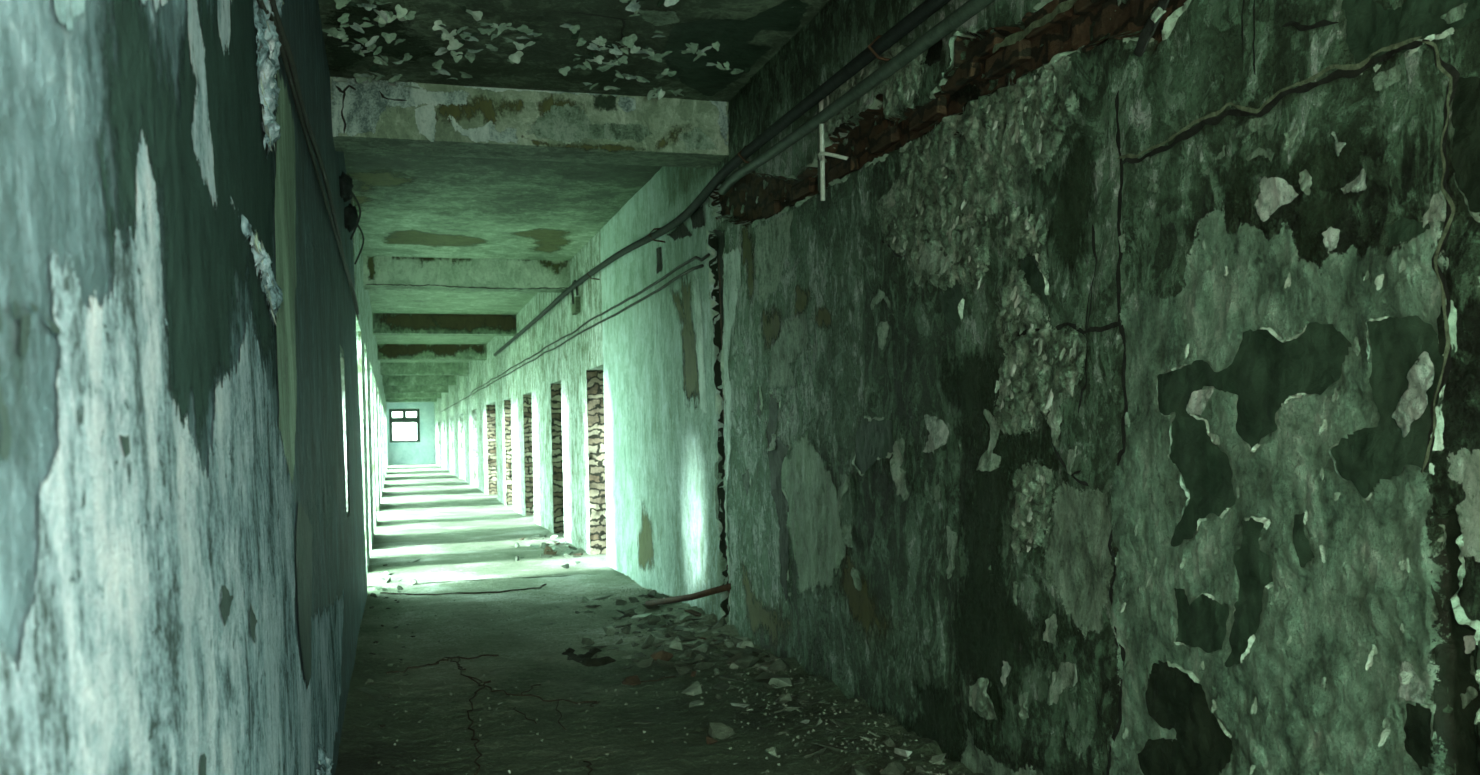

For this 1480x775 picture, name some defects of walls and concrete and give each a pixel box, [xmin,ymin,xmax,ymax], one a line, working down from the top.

peeling [54,0,85,31]
peeling [187,0,232,207]
spalling [322,0,809,146]
spalling [1342,0,1480,91]
spalling [656,0,1191,502]
crack [1018,0,1460,486]
peeling [0,70,344,775]
peeling [757,313,862,603]
peeling [946,525,958,580]
peeling [961,660,1044,775]
crack [1094,530,1126,775]
peeling [1043,76,1480,775]